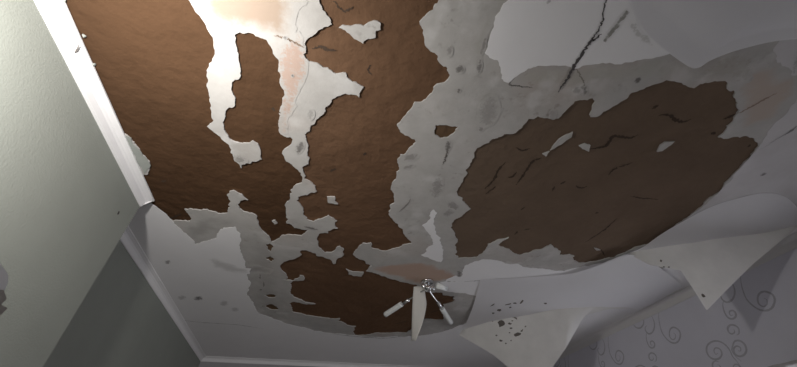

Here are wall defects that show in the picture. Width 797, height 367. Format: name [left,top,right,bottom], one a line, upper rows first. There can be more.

peeling [485,0,670,83]
crack [558,0,607,92]
flaking render [66,0,450,335]
flaking render [424,80,797,319]
leakage [369,261,463,286]